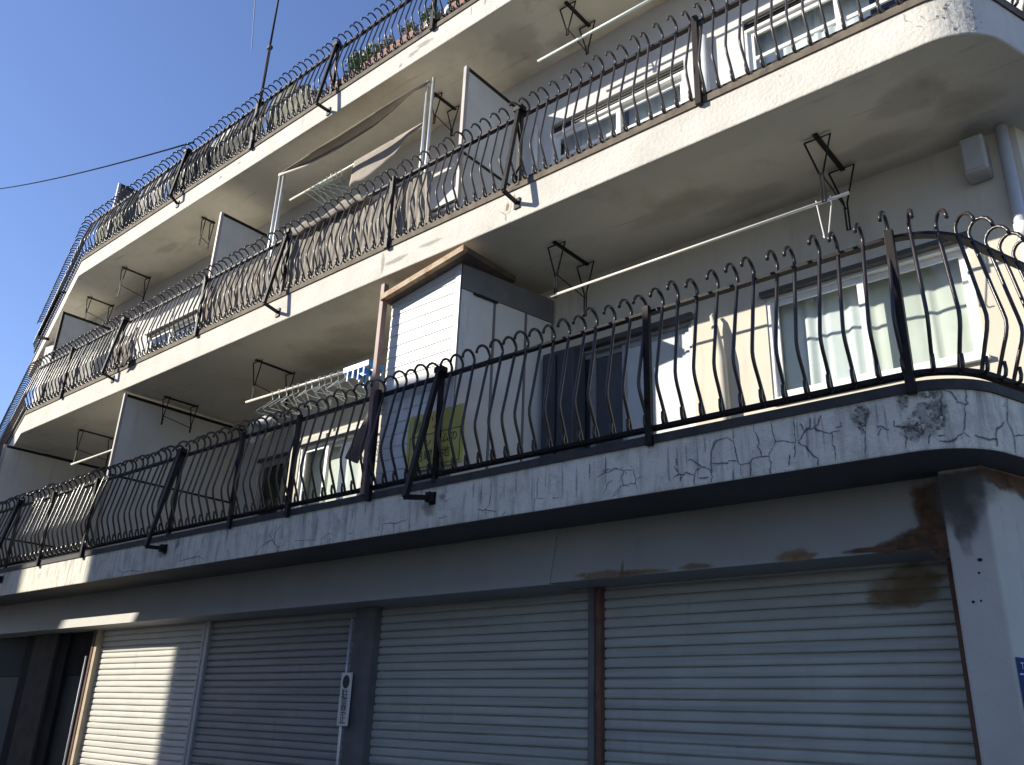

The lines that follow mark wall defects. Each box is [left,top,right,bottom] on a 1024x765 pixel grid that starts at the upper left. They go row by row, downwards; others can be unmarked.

crack [674,390,1024,485]
crack [589,464,641,497]
corrosion [844,484,949,558]